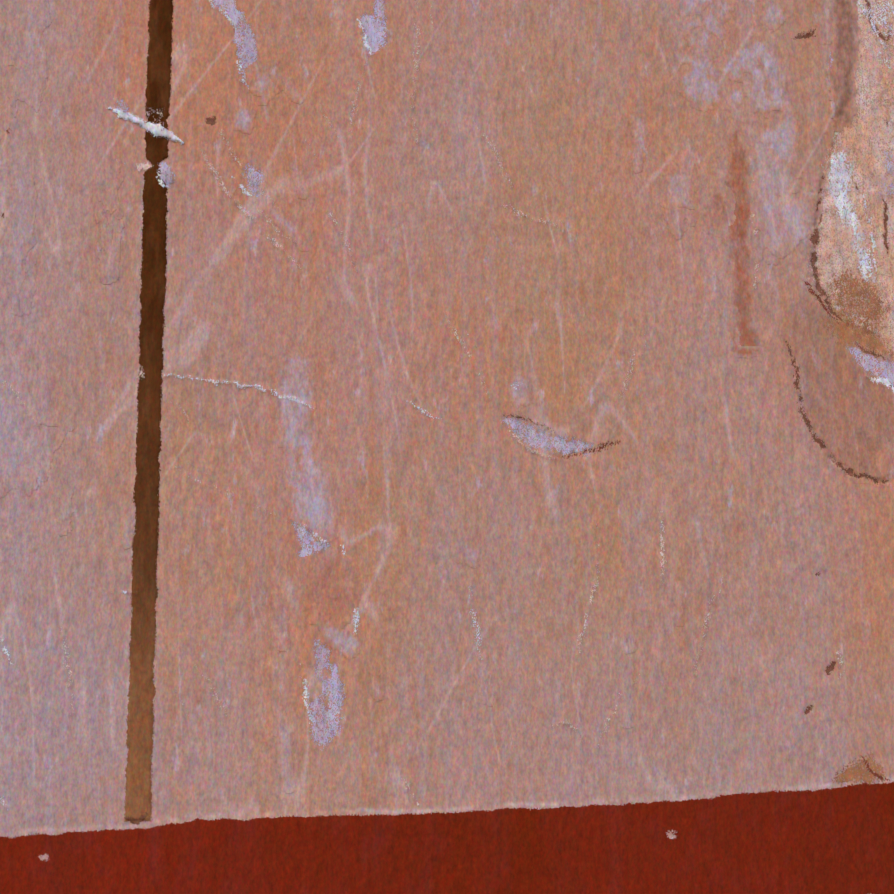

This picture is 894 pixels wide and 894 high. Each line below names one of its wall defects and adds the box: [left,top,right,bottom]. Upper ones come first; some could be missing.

peeling [209,0,304,134]
spalling [803,0,894,393]
crack [802,280,839,324]
spalling [500,372,620,460]
crack [785,341,888,485]